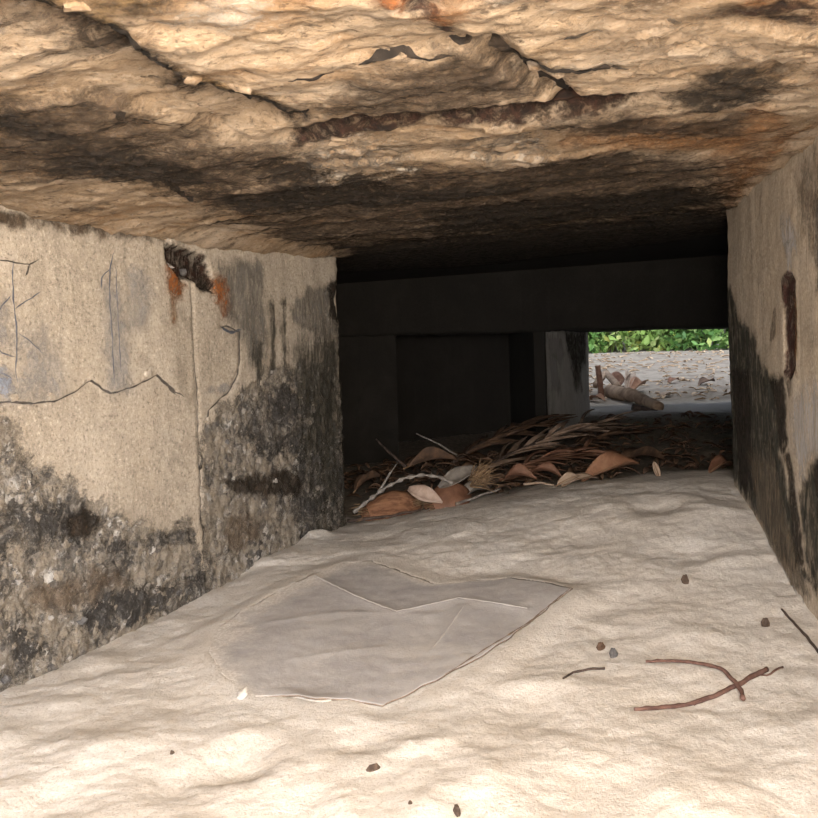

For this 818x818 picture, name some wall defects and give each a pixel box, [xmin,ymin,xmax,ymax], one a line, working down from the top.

leakage [2,0,172,54]
crack [24,0,312,127]
crack [288,72,333,82]
leakage [317,33,540,119]
crack [359,33,629,89]
crack [564,27,631,40]
spalling [164,238,214,292]
rust [167,267,186,324]
rust [211,276,230,316]
leakage [0,62,812,530]
rust [770,270,797,395]
leakage [770,378,818,590]